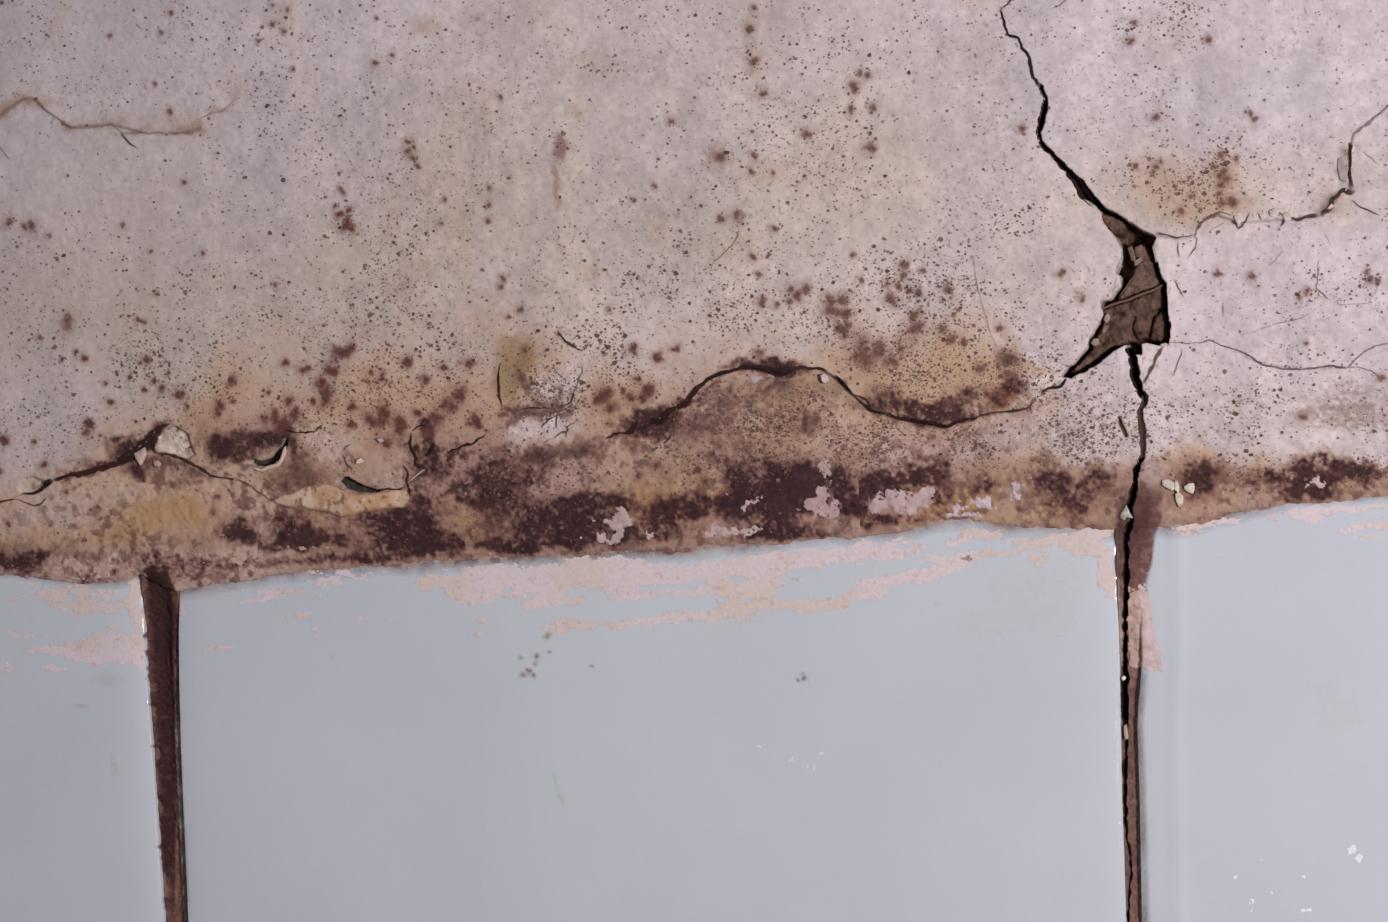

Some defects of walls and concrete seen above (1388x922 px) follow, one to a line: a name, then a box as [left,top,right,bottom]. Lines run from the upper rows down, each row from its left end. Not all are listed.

leakage [532,26,655,78]
leakage [621,0,701,58]
leakage [948,0,1065,61]
crack [1000,0,1094,205]
crack [1159,105,1388,295]
crack [497,334,588,437]
crack [606,365,1070,441]
crack [0,423,266,506]
peeling [252,430,410,518]
crack [379,425,485,496]
peeling [55,552,122,584]
crack [1120,339,1373,922]